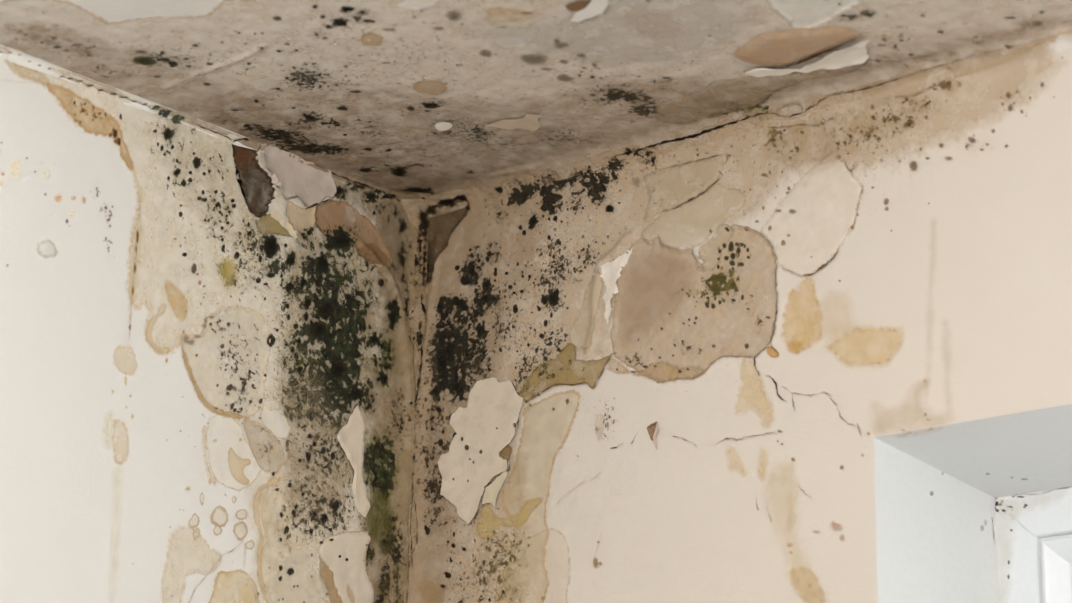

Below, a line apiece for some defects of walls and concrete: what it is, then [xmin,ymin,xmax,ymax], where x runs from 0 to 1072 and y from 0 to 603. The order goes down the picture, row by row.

damp [0,22,119,91]
damp [128,1,686,200]
crack [612,47,1005,158]
damp [838,3,888,22]
spalling [232,138,390,265]
damp [190,27,1072,603]
spalling [437,224,778,524]
crack [753,327,870,435]
peeling [337,405,371,517]
crack [673,432,775,446]
peeling [311,531,374,603]